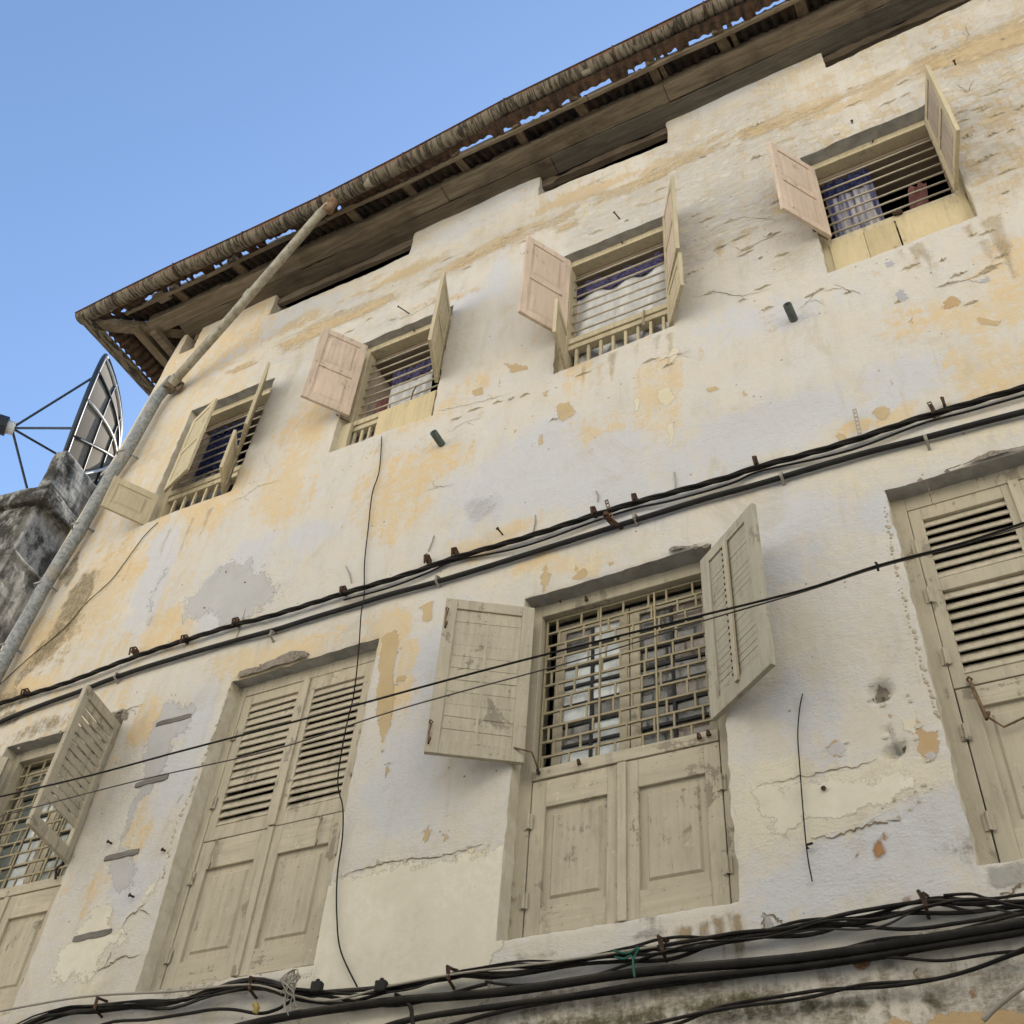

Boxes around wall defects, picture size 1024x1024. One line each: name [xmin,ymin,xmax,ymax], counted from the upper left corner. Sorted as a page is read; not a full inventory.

peeling [953,88,1024,139]
peeling [713,234,788,259]
peeling [938,251,1011,309]
peeling [451,387,530,421]
peeling [550,401,576,421]
water stain [18,552,93,682]
peeling [182,557,280,626]
peeling [419,601,433,621]
peeling [867,507,942,762]
peeling [376,630,406,778]
spalling [811,783,933,839]
peeling [51,700,196,987]